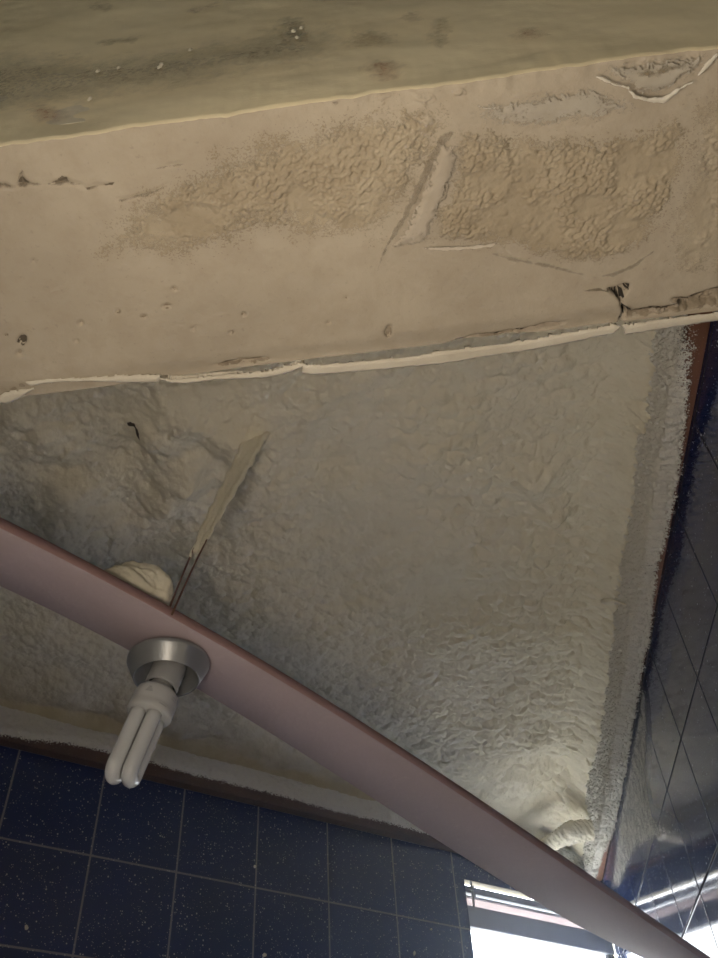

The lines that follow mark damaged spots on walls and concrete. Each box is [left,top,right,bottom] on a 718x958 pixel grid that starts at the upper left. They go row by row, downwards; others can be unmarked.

flaking render [596,53,718,104]
crack [0,176,29,186]
crack [53,176,114,190]
crack [587,283,631,317]